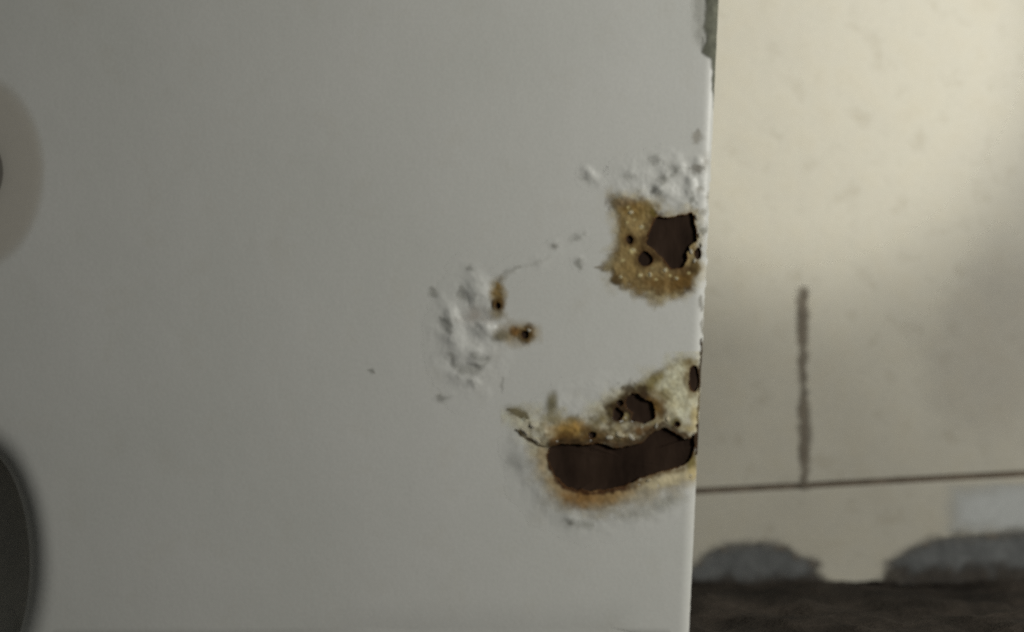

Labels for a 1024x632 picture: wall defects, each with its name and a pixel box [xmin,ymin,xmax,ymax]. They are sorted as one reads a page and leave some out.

corrosion [599,196,702,297]
spalling [638,213,703,269]
corrosion [491,282,505,317]
corrosion [495,324,535,343]
hole [689,366,699,391]
corrosion [512,338,703,510]
hole [547,393,695,491]